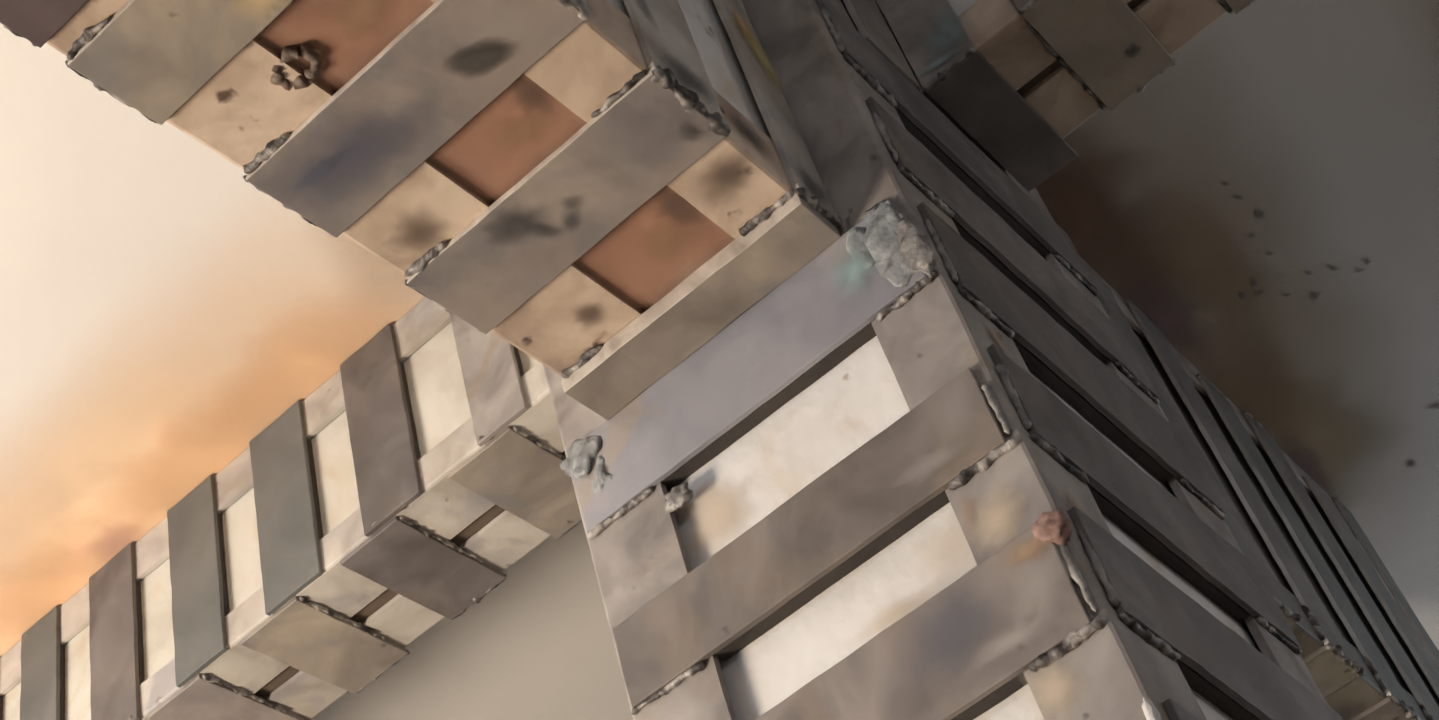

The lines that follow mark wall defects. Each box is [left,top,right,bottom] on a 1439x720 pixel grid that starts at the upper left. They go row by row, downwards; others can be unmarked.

leakage [1035,158,1361,487]
leakage [0,343,348,657]